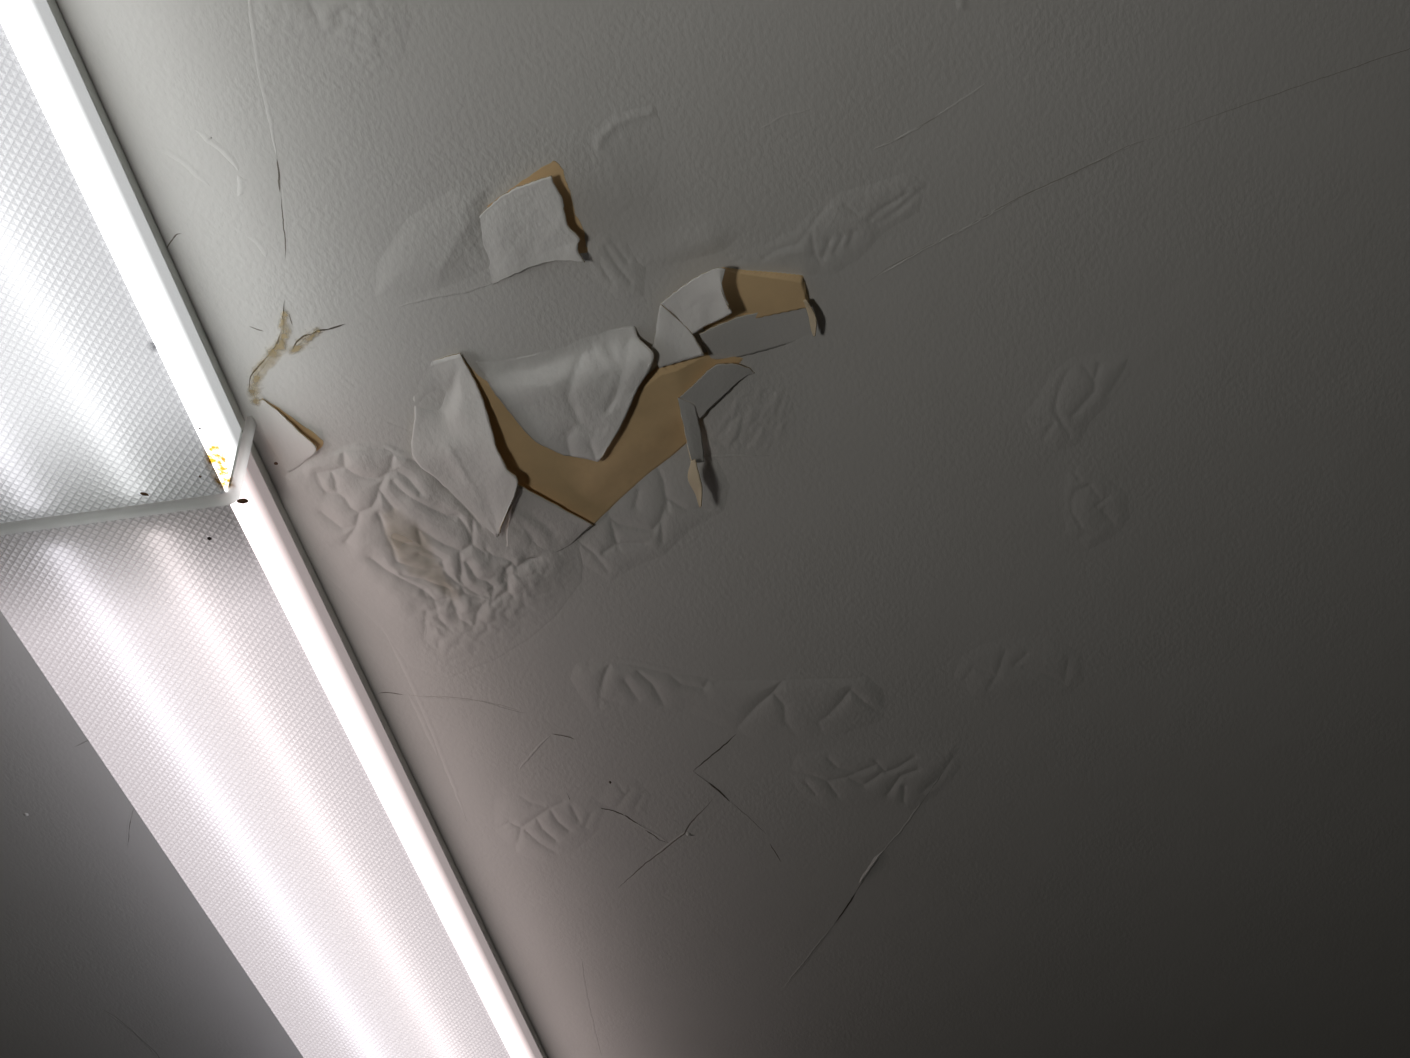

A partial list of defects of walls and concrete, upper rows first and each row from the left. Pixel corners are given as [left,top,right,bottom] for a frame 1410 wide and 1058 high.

peeling [375,161,588,307]
peeling [411,267,817,559]
crack [567,735,780,883]
crack [784,772,943,987]